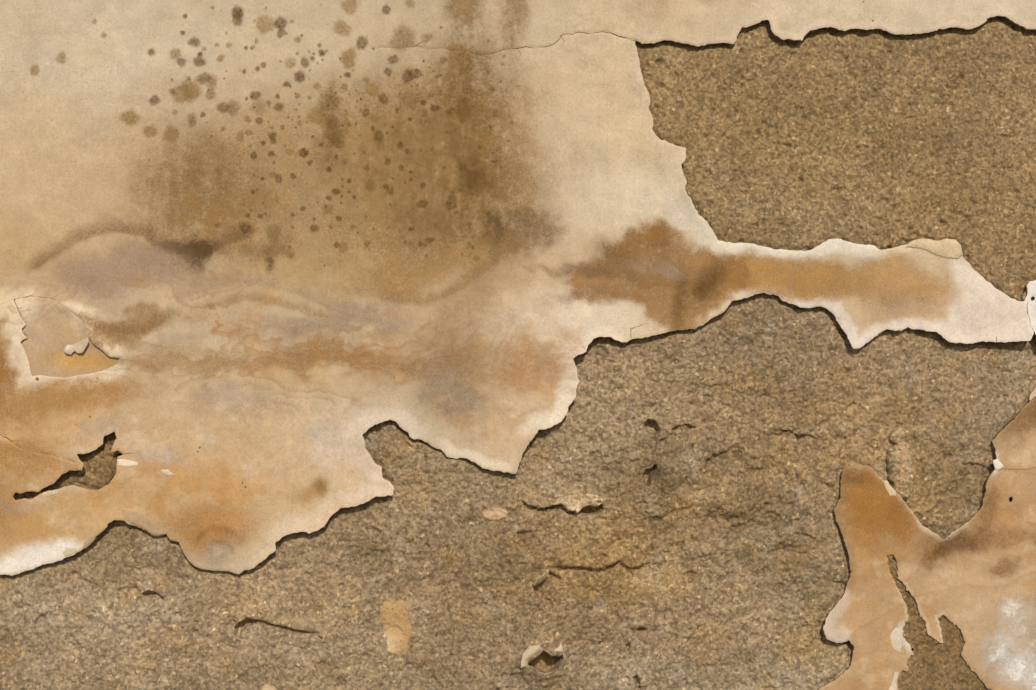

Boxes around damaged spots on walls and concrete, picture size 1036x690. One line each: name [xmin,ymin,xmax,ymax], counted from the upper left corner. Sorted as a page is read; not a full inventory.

leakage [340,37,374,77]
leakage [73,46,552,302]
flaking render [635,16,1036,301]
leakage [84,304,170,351]
leakage [0,342,119,415]
flaking render [0,293,1036,690]
leakage [988,599,1036,690]